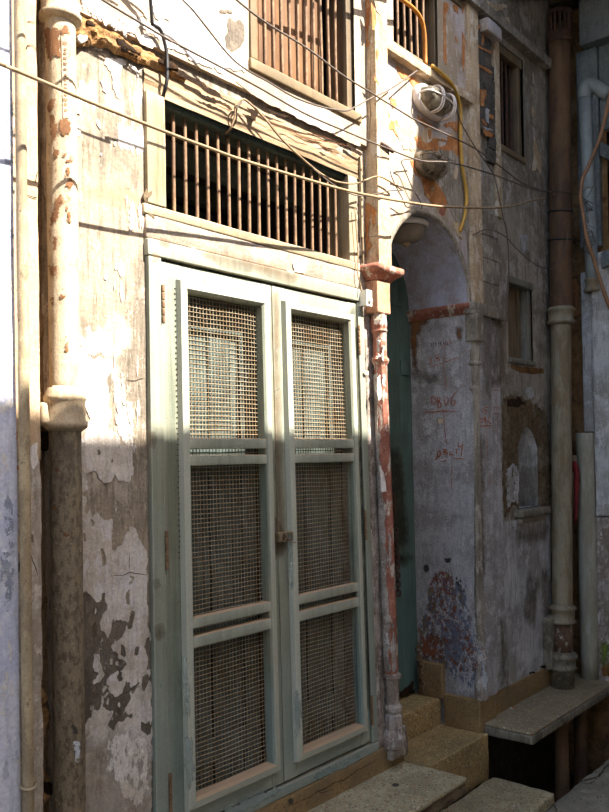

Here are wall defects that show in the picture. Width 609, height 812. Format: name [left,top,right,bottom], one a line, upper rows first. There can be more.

rust [44,24,70,61]
peeling [396,66,420,87]
flaking render [478,24,497,165]
rust [47,98,74,226]
peeling [126,189,155,232]
peeling [388,98,469,239]
spalling [502,387,551,517]
peeling [80,325,153,812]
peeling [416,558,489,697]